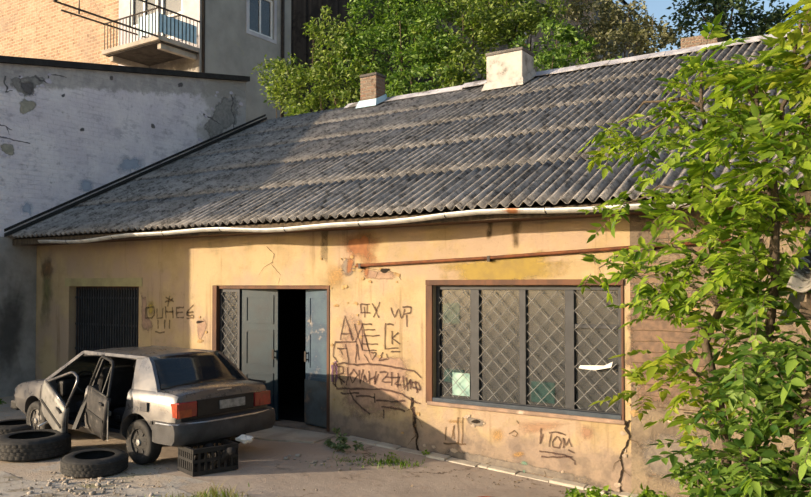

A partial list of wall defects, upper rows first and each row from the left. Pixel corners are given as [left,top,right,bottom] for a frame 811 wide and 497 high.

spalling [4,73,67,114]
peeling [198,91,243,142]
peeling [0,139,19,157]
rust [346,234,375,276]
crack [407,397,422,451]
crack [612,420,641,492]